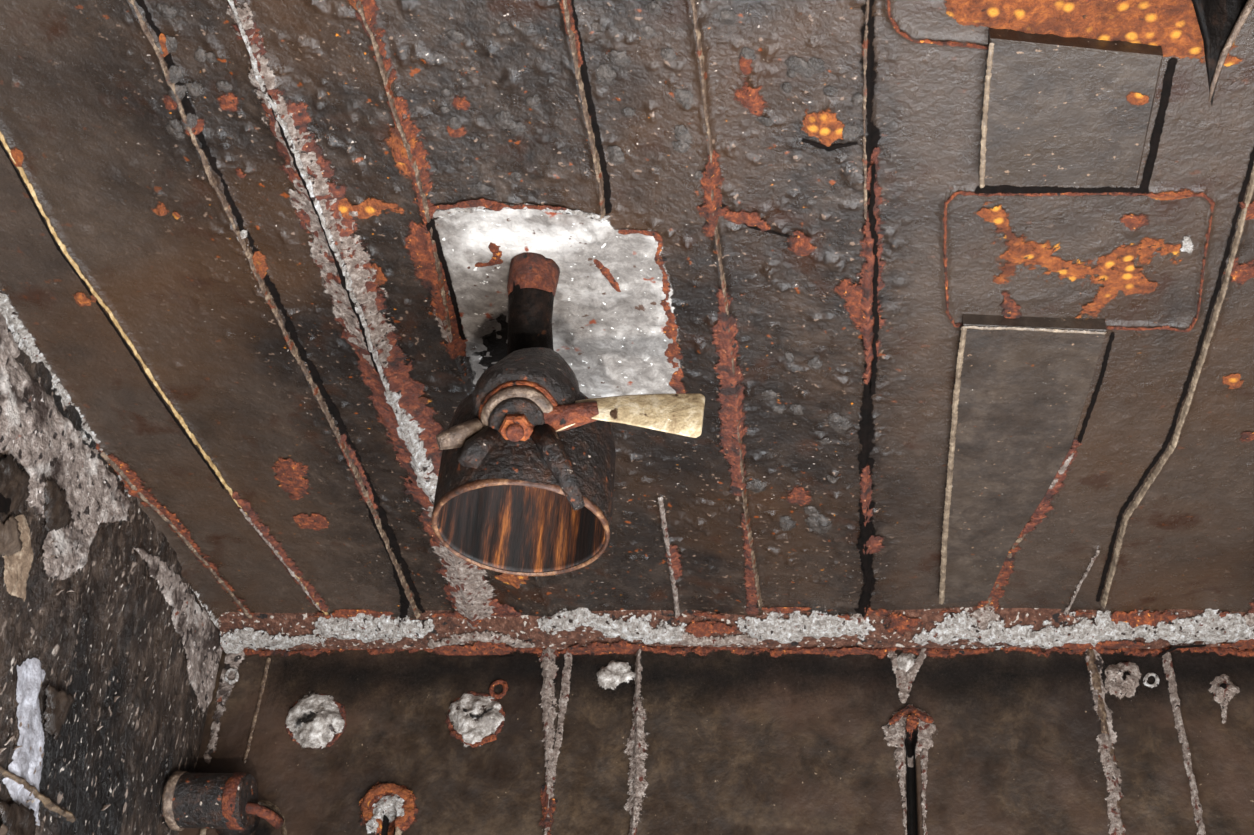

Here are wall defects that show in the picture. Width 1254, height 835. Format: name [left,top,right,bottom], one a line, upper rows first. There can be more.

rust [152,202,181,219]
rust [225,0,1254,659]
peeling [0,313,132,602]
peeling [0,658,74,835]
peeling [133,547,245,764]